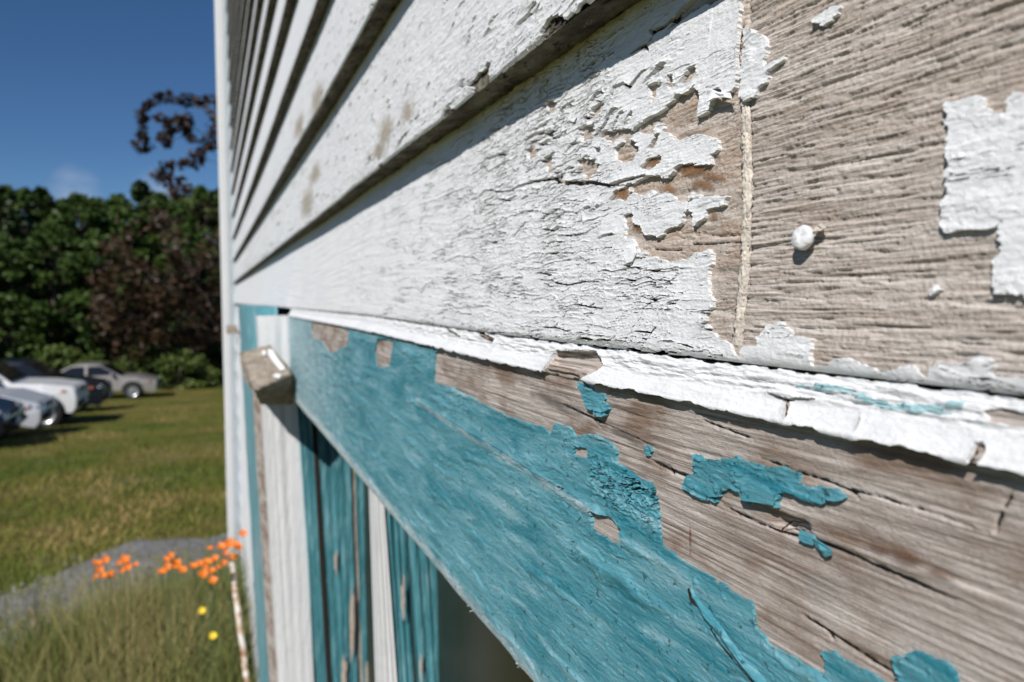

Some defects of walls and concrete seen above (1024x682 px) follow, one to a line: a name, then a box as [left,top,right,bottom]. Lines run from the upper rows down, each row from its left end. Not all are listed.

peeling [480,0,1024,387]
peeling [312,321,355,353]
crack [970,445,986,464]
peeling [372,332,1024,682]
crack [766,459,925,510]
crack [998,495,1013,526]
crack [728,507,957,600]
crack [807,617,895,674]